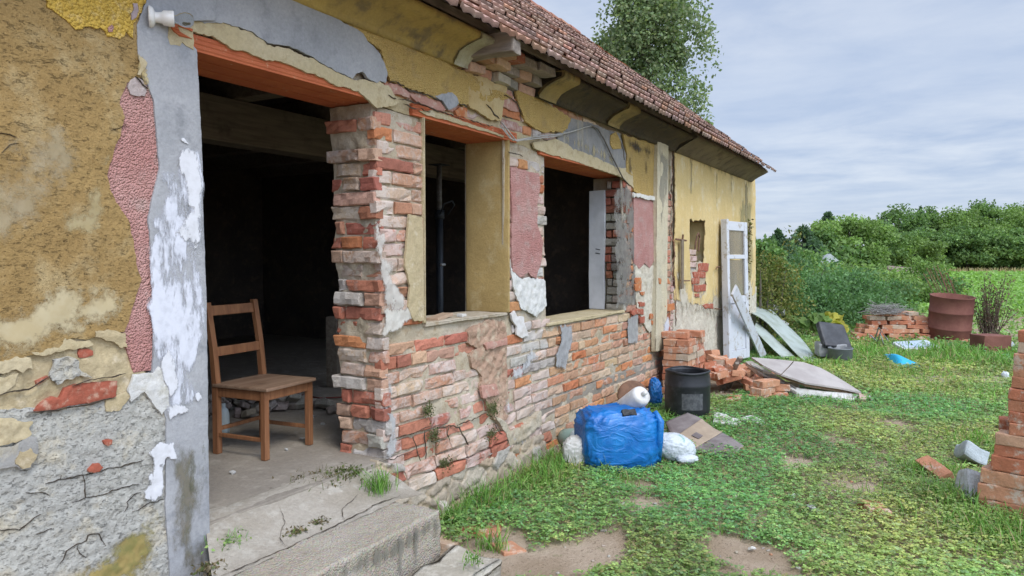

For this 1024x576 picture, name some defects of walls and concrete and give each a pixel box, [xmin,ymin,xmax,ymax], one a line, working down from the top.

peeling [46,0,146,39]
spalling [168,24,194,50]
spalling [454,32,495,69]
peeling [127,76,148,96]
spalling [385,83,467,118]
peeling [147,138,205,419]
spalling [630,277,653,325]
spalling [690,261,714,309]
spalling [0,329,146,470]
crack [0,460,162,534]
crack [60,533,106,563]
crack [226,494,400,574]